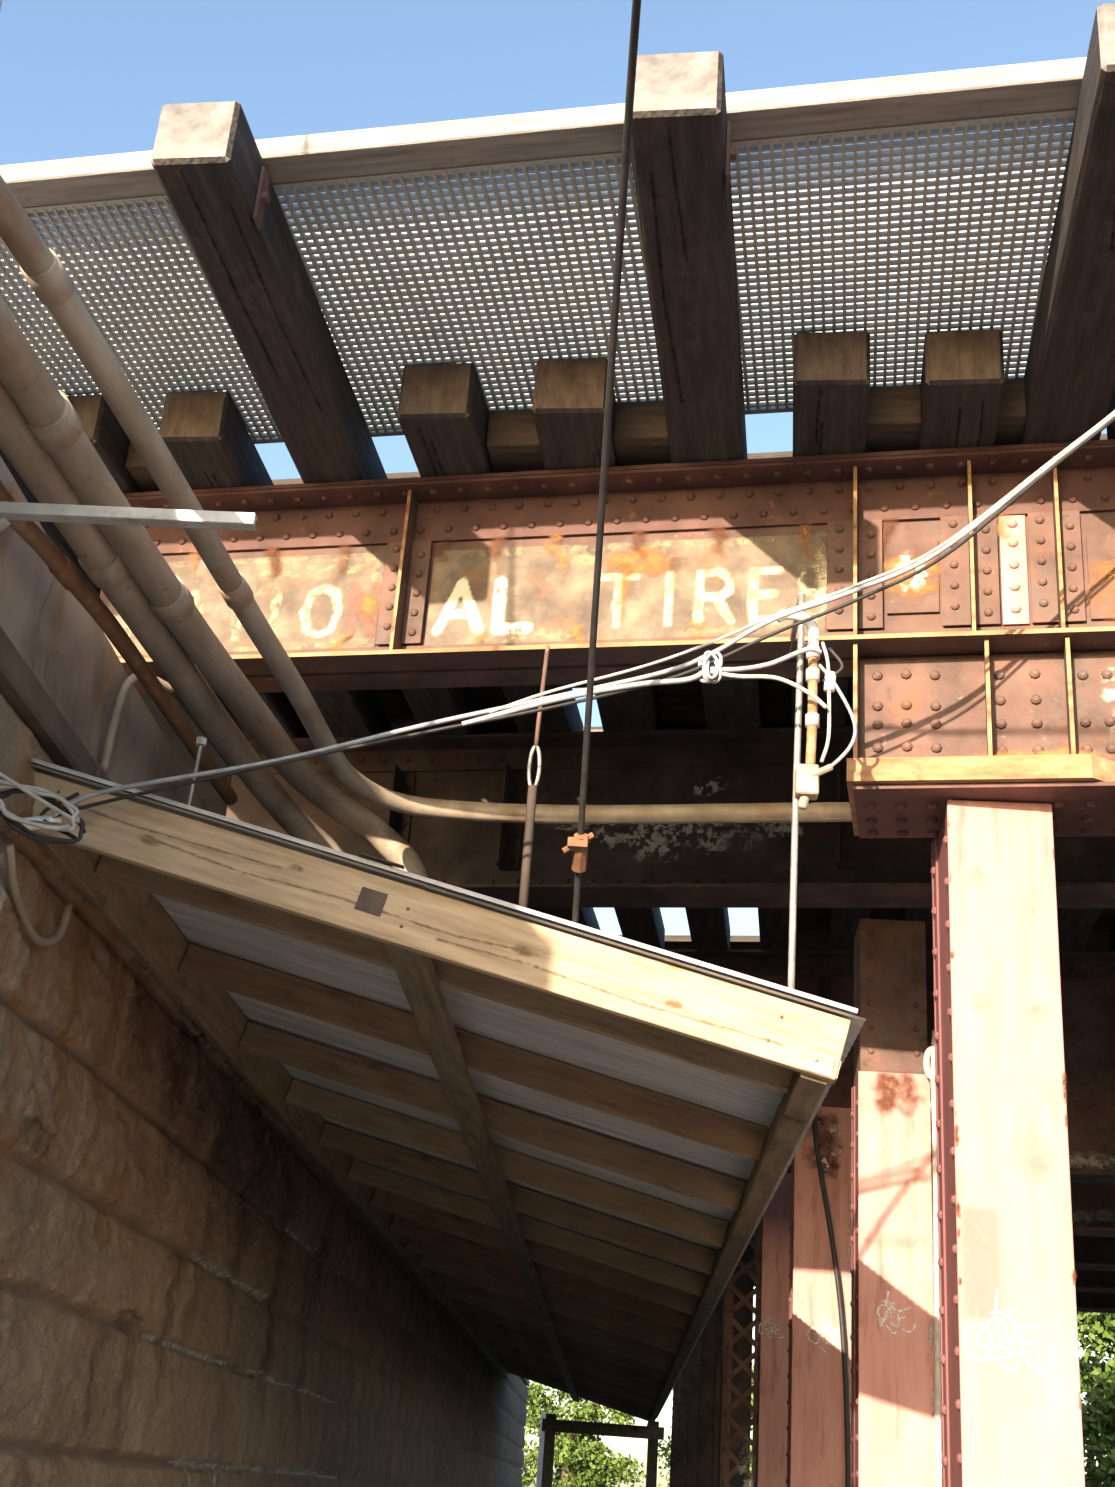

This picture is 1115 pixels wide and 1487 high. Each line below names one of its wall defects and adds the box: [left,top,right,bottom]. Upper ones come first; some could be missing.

corrosion [267,547,279,575]
corrosion [609,530,670,602]
corrosion [882,519,938,595]
peeling [693,780,725,795]
peeling [556,822,803,861]
corrosion [876,1074,918,1110]